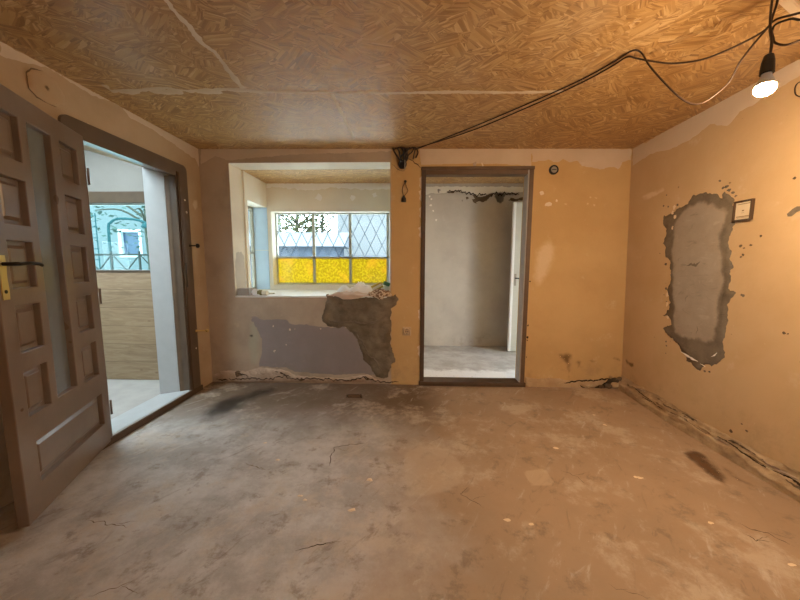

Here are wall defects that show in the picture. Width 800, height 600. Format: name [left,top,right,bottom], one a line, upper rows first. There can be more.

peeling [418,176,523,238]
peeling [212,317,397,383]
damp [212,391,266,414]
damp [685,451,723,482]